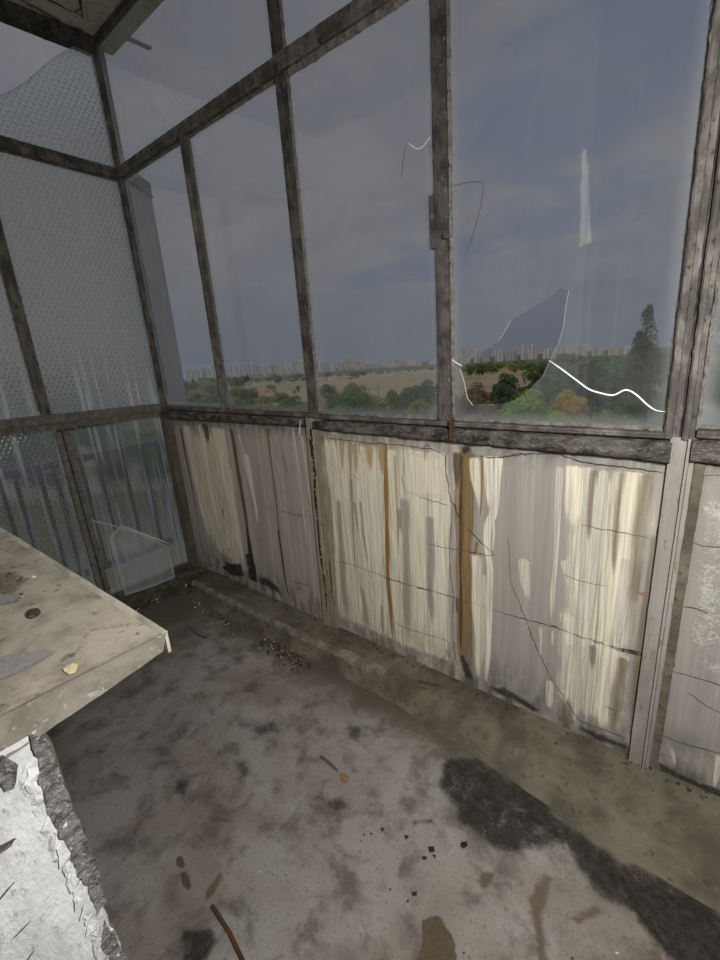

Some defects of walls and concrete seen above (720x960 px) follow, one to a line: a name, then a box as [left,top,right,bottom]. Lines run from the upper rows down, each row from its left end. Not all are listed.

peeling [309,429,333,617]
corrosion [335,438,399,636]
corrosion [453,447,483,678]
crack [329,438,665,738]
crack [673,671,720,713]
spalling [0,734,129,960]
water stain [440,759,720,960]